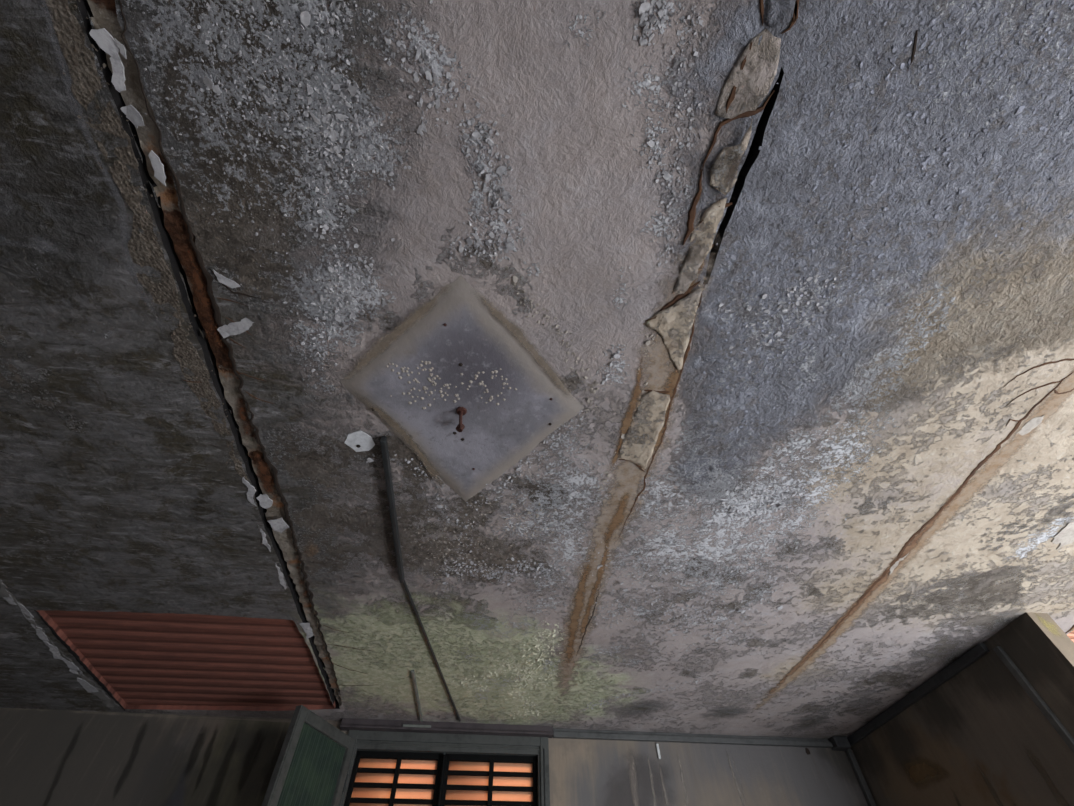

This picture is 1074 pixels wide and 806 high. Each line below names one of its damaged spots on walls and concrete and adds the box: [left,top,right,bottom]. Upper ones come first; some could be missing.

spalling [41,0,248,480]
crack [76,0,371,709]
peeling [120,0,842,658]
crack [576,586,601,656]
crack [614,67,784,544]
crack [759,0,799,34]
crack [909,30,918,67]
crack [797,358,1074,667]